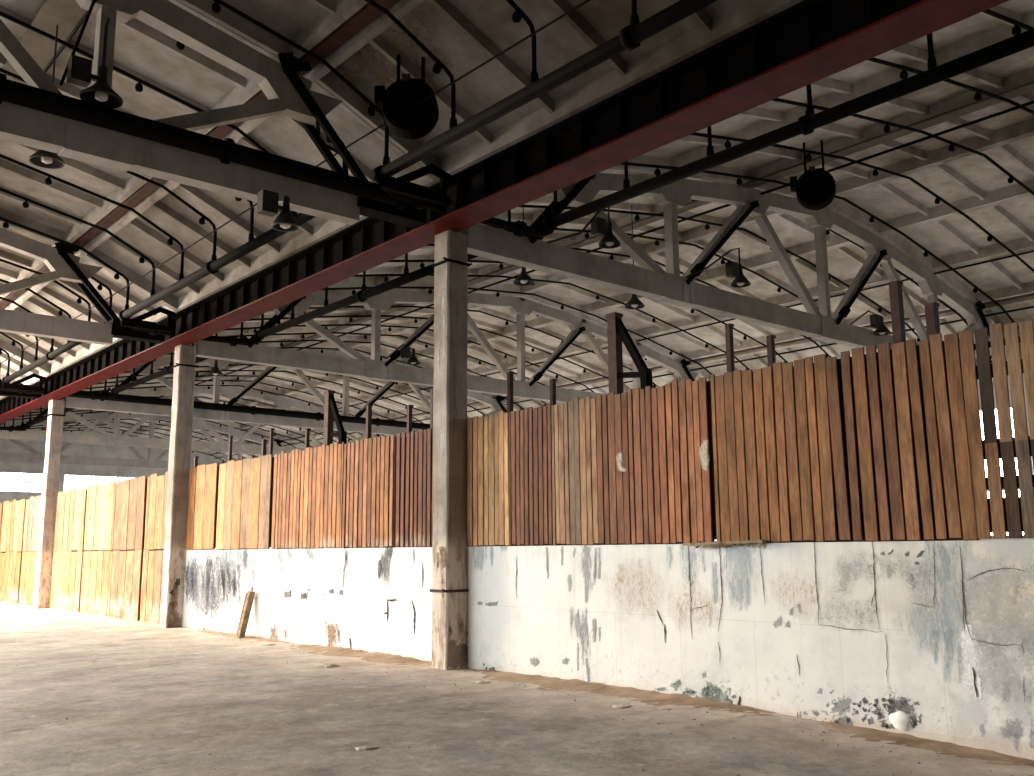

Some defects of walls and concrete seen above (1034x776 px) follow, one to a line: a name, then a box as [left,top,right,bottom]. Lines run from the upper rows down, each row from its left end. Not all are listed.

damp [184,549,258,618]
damp [667,545,751,610]
damp [887,546,1034,751]
crack [914,546,1027,702]
peeling [655,671,736,704]
spalling [798,688,922,729]